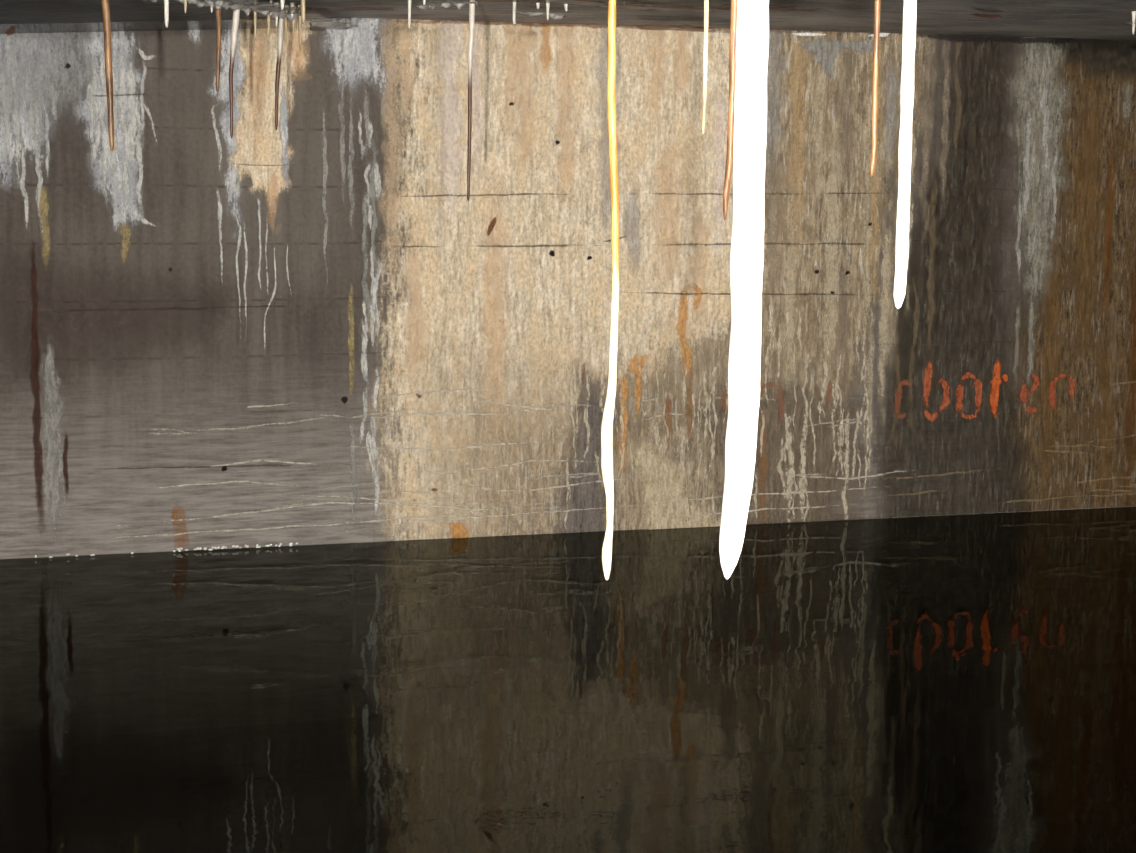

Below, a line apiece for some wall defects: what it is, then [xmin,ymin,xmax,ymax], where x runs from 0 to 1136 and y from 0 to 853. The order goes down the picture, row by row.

damp [0,1,312,357]
crack [143,0,356,29]
damp [322,2,733,541]
rust [411,0,731,33]
rust [620,354,646,457]
rust [677,284,702,373]
damp [746,30,1136,524]
rust [916,34,1136,511]